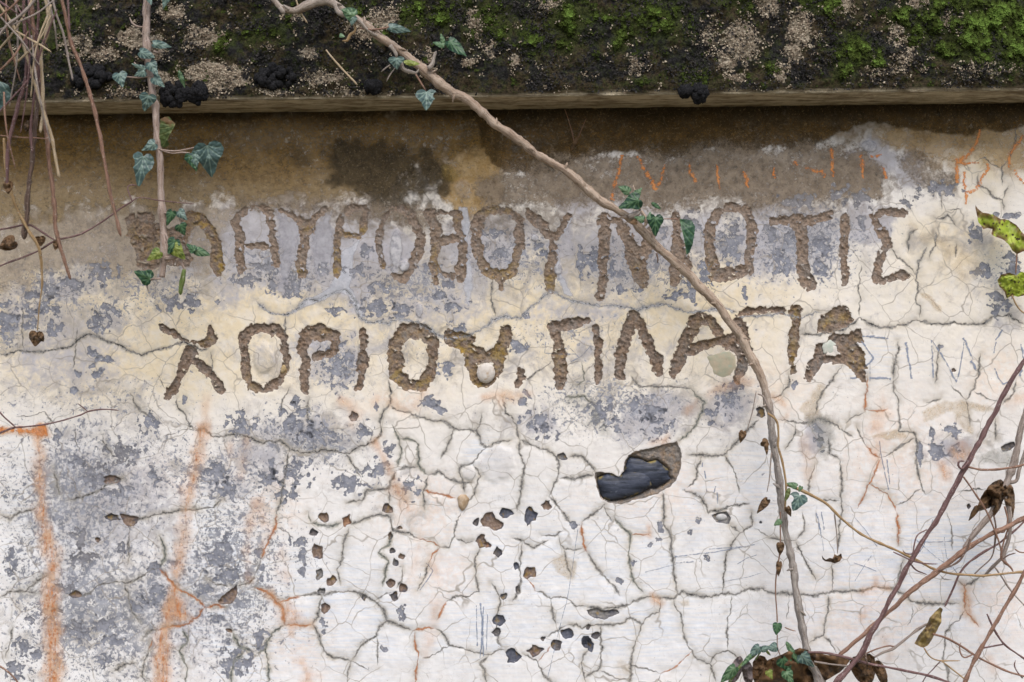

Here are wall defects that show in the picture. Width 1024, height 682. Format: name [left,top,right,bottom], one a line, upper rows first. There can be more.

damp [0,103,1024,296]
damp [464,254,473,304]
crack [2,313,213,374]
crack [84,203,1022,682]
crack [54,470,119,500]
flaking render [473,500,552,558]
crack [2,576,45,597]
rust [37,470,61,682]
rust [154,555,186,682]
peeling [288,513,337,635]
peeling [386,579,408,622]
flaking render [505,608,619,663]